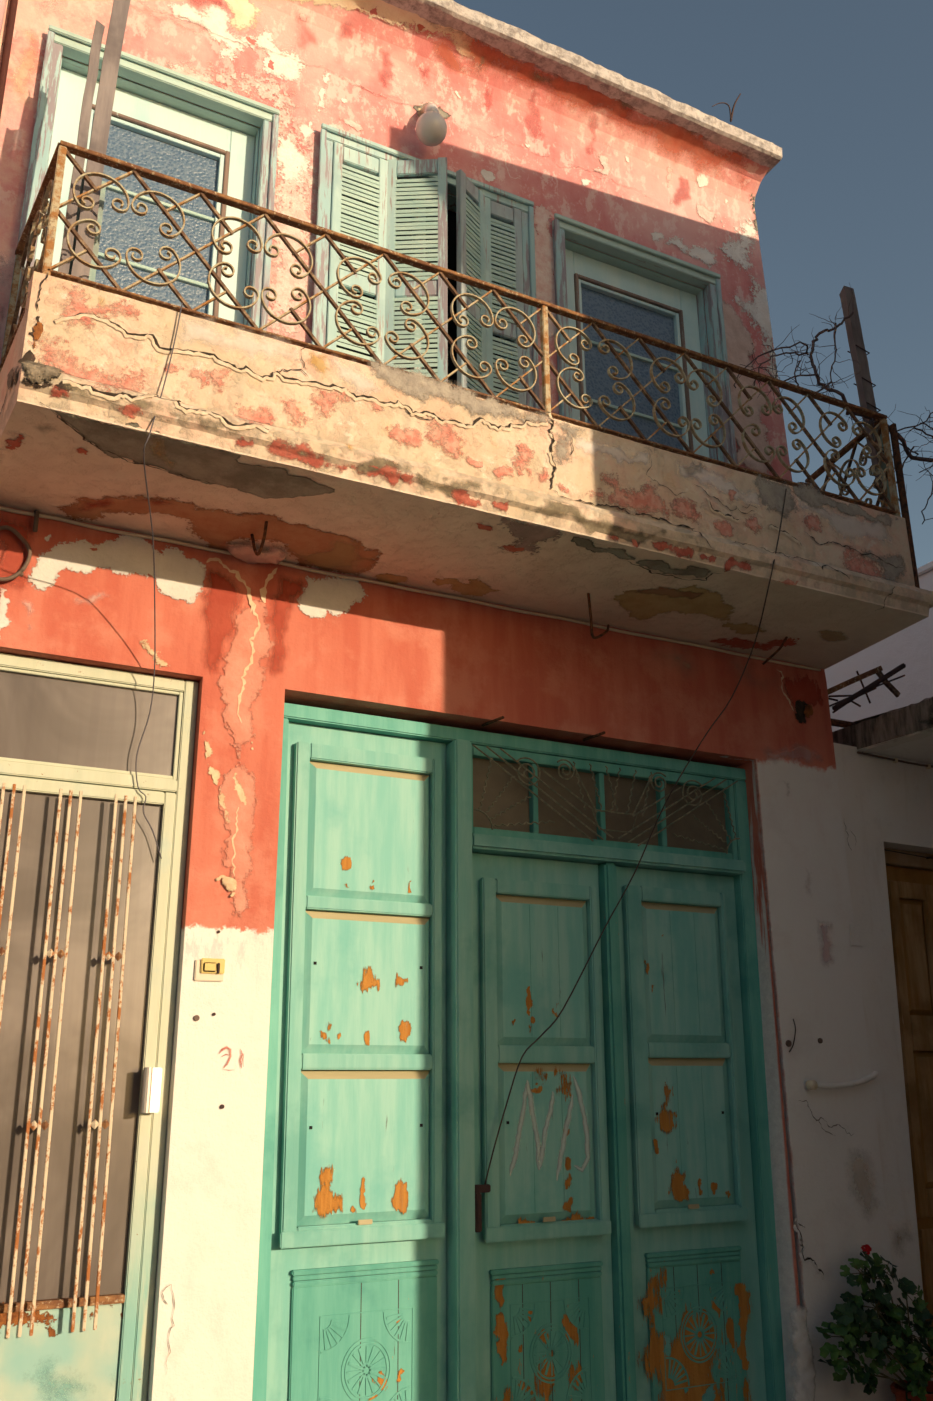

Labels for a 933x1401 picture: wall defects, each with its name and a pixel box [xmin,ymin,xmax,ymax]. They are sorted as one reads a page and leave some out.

peeling [289,0,477,59]
peeling [165,0,363,341]
peeling [581,155,629,186]
peeling [534,204,556,351]
peeling [651,199,779,388]
spalling [7,273,335,499]
peeling [425,419,514,481]
crack [54,313,903,612]
peeling [27,532,208,603]
peeling [297,573,408,620]
peeling [477,497,767,635]
damp [57,495,383,918]